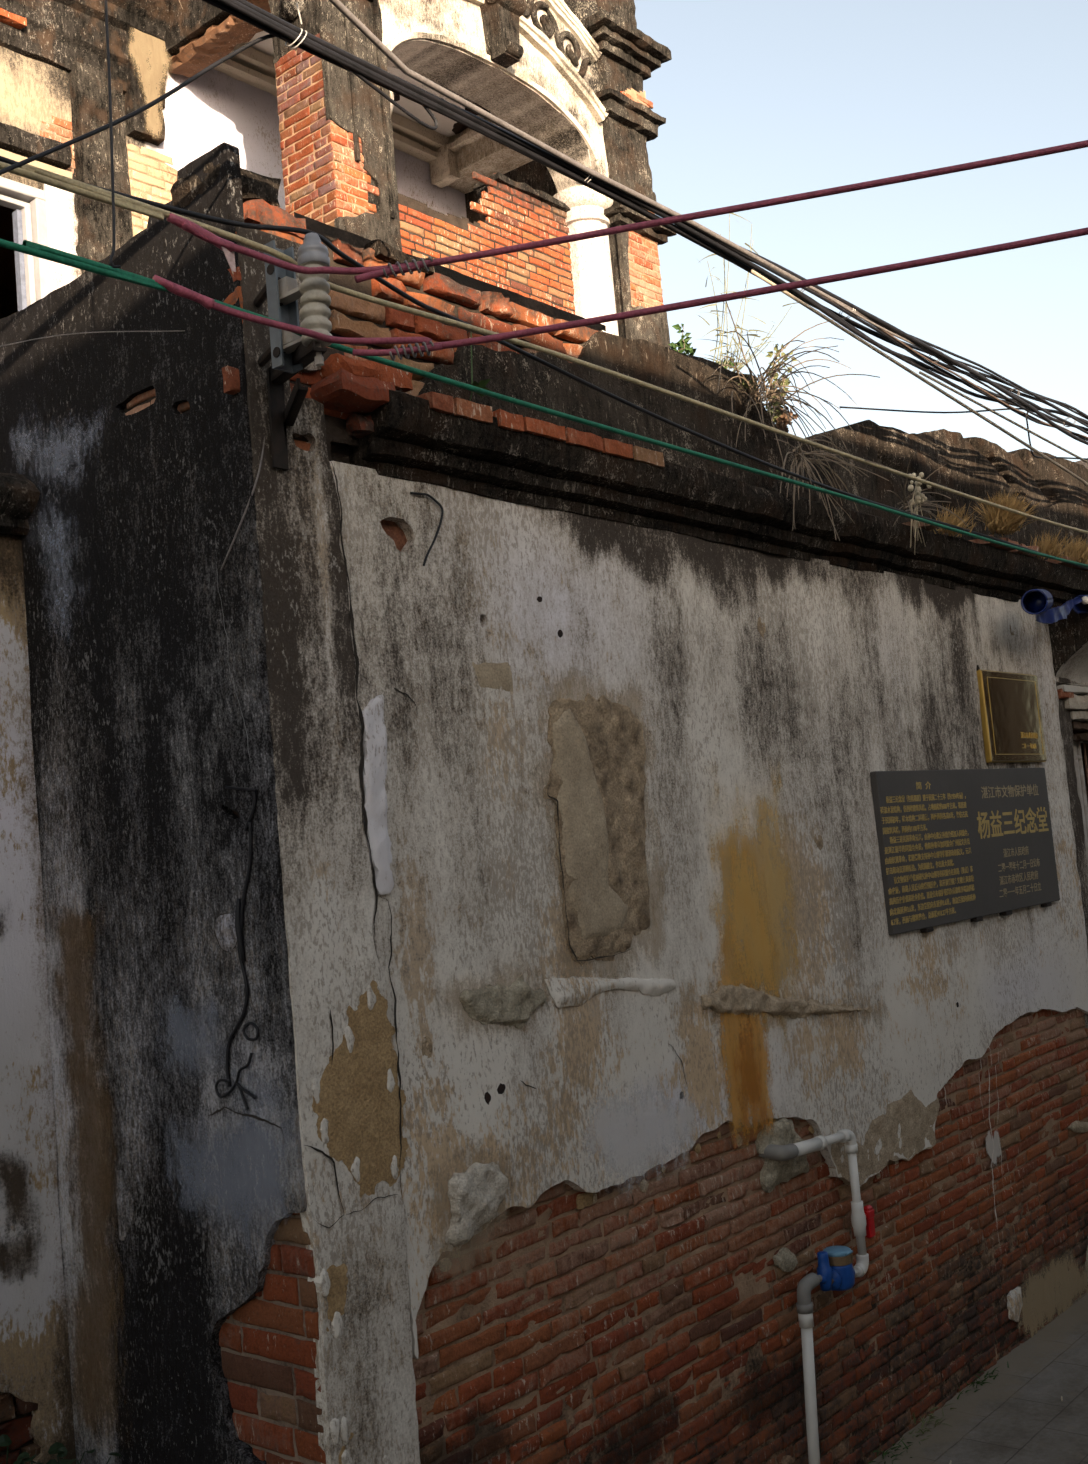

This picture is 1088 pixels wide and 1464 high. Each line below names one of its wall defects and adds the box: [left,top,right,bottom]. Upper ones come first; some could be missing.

spalling [274,33,379,227]
water stain [11,411,106,484]
rust [711,777,798,997]
water stain [0,1155,40,1280]
water stain [49,907,124,1444]
water stain [166,1070,294,1251]
peeling [311,980,408,1198]
rust [720,1012,774,1140]
spalling [412,1009,1088,1464]
spalling [0,1392,41,1464]
spalling [219,1213,354,1464]